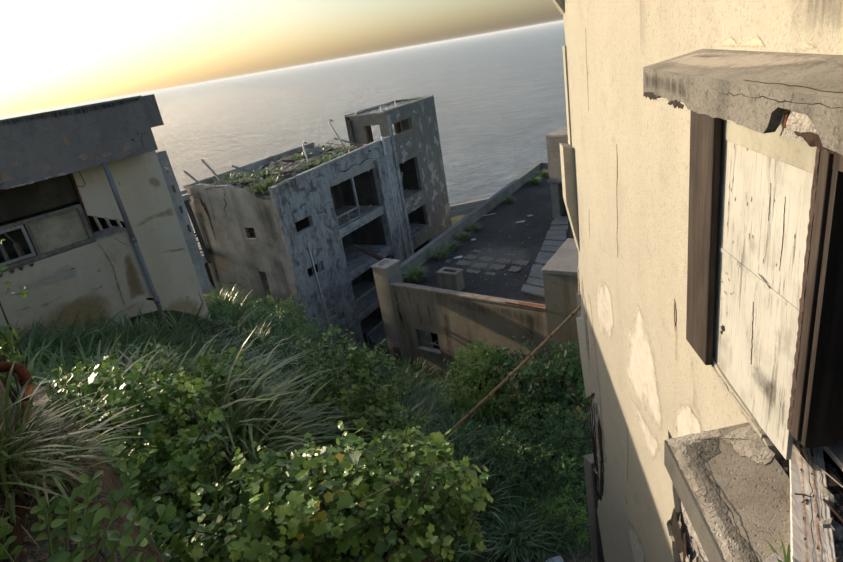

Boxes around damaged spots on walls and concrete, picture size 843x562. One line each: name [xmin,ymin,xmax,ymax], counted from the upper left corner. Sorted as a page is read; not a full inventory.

peeling [400,110,450,229]
crack [718,80,843,108]
spalling [779,111,836,154]
leakage [126,258,143,295]
spalling [668,425,775,562]
corrosion [800,444,821,562]